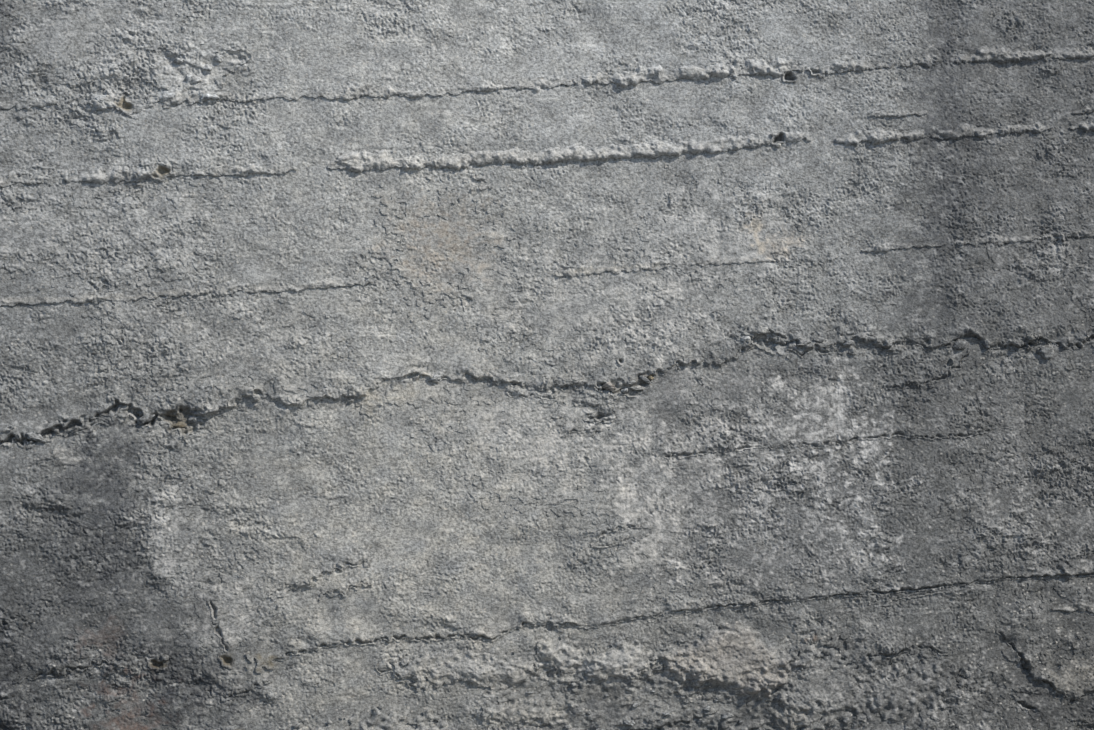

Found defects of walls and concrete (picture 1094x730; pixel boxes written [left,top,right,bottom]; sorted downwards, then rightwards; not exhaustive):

water stain [0,164,355,730]
crack [0,326,1094,448]
crack [204,593,229,652]
crack [222,572,1094,701]